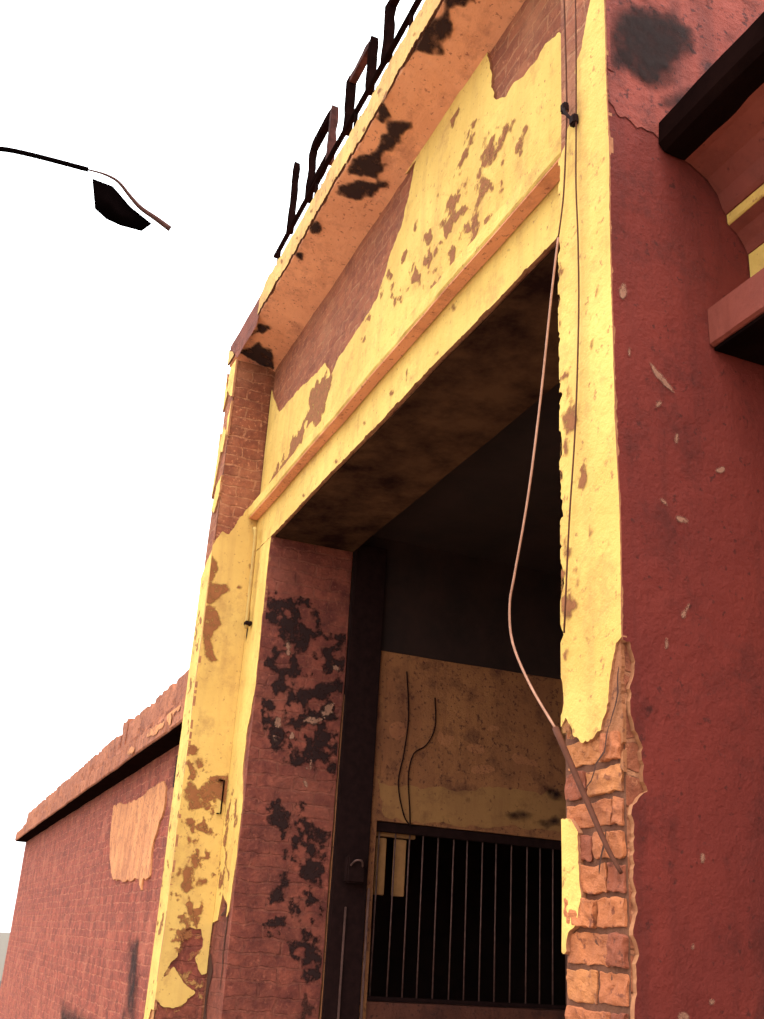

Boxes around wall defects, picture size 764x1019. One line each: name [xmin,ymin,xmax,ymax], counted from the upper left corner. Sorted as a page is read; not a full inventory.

spalling [490,0,590,154]
water stain [613,6,691,84]
spalling [194,119,528,662]
spalling [560,371,577,454]
spalling [578,463,587,489]
spalling [561,594,577,617]
peeling [110,591,346,1019]
spalling [378,641,631,1019]